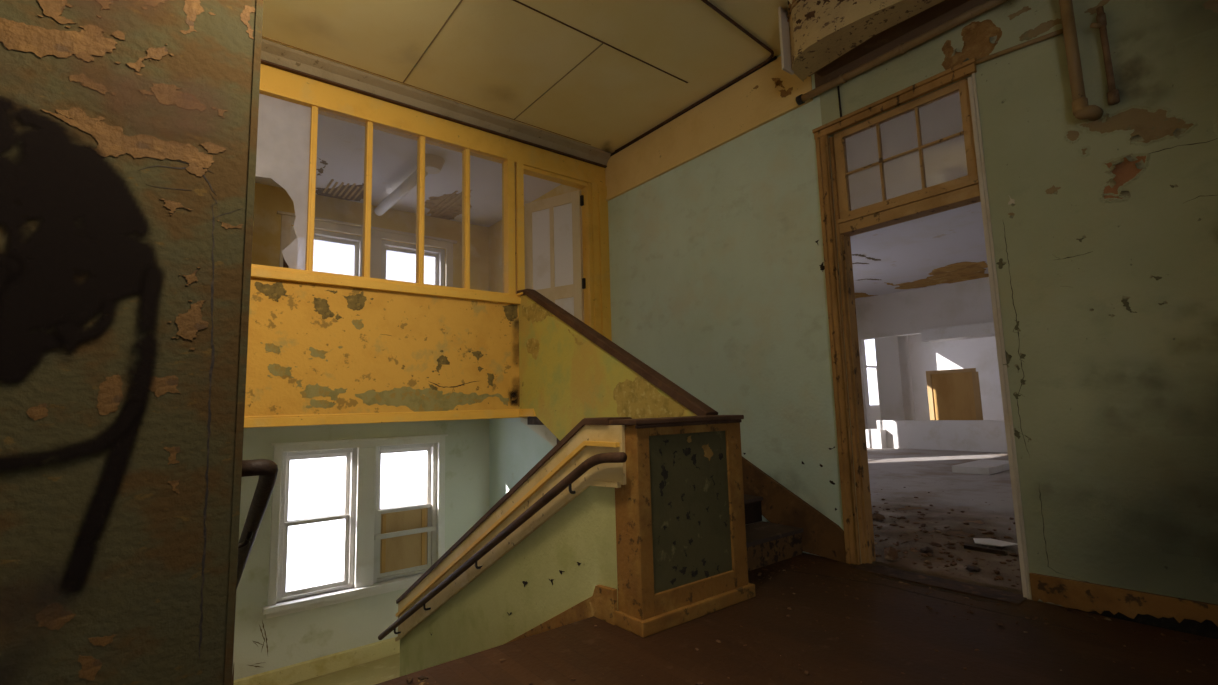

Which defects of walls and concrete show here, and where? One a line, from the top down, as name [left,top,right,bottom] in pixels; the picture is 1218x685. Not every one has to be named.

peeling [0,0,228,118]
peeling [240,5,256,39]
peeling [796,0,857,24]
flaking render [942,6,1032,70]
peeling [41,107,226,177]
peeling [1063,105,1198,204]
peeling [168,300,209,350]
peeling [255,282,290,302]
peeling [313,290,374,330]
crack [1003,223,1030,457]
peeling [260,342,509,412]